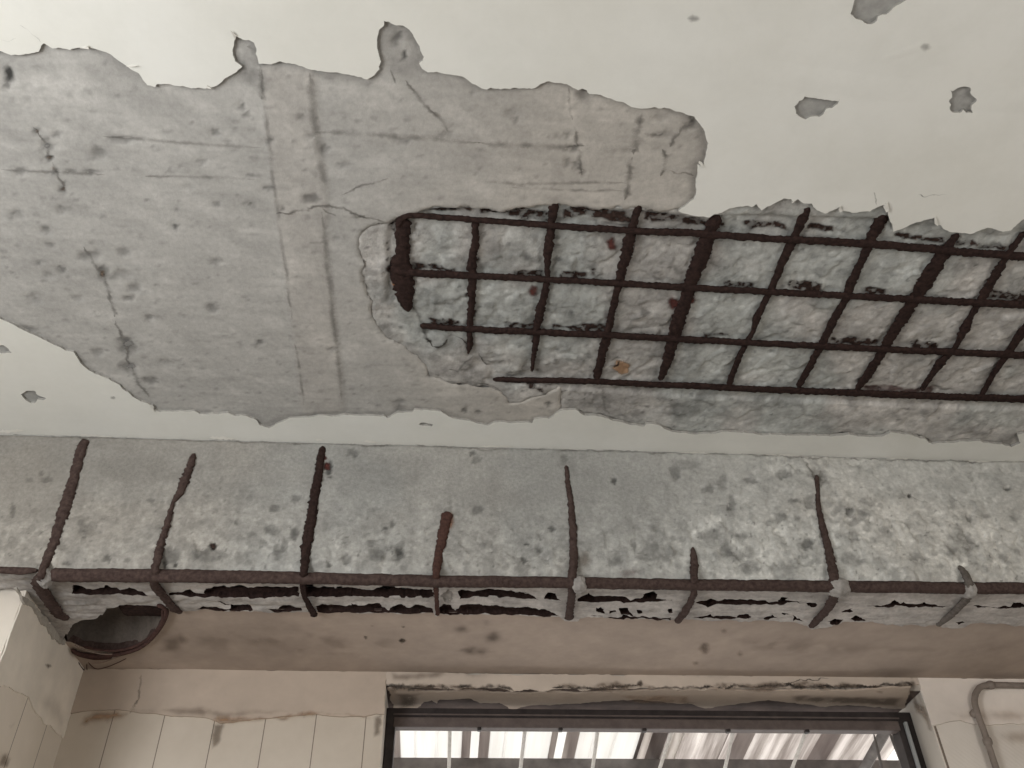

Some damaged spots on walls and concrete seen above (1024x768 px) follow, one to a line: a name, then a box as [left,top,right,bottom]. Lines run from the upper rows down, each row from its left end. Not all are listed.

peeling [851,0,902,23]
corrosion [434,207,548,221]
flaking render [0,21,1024,445]
corrosion [563,207,630,223]
corrosion [644,210,706,225]
corrosion [744,220,786,229]
corrosion [808,223,833,231]
corrosion [895,232,1006,250]
corrosion [788,280,821,291]
corrosion [553,323,606,331]
corrosion [831,336,878,345]
spalling [0,435,1024,640]